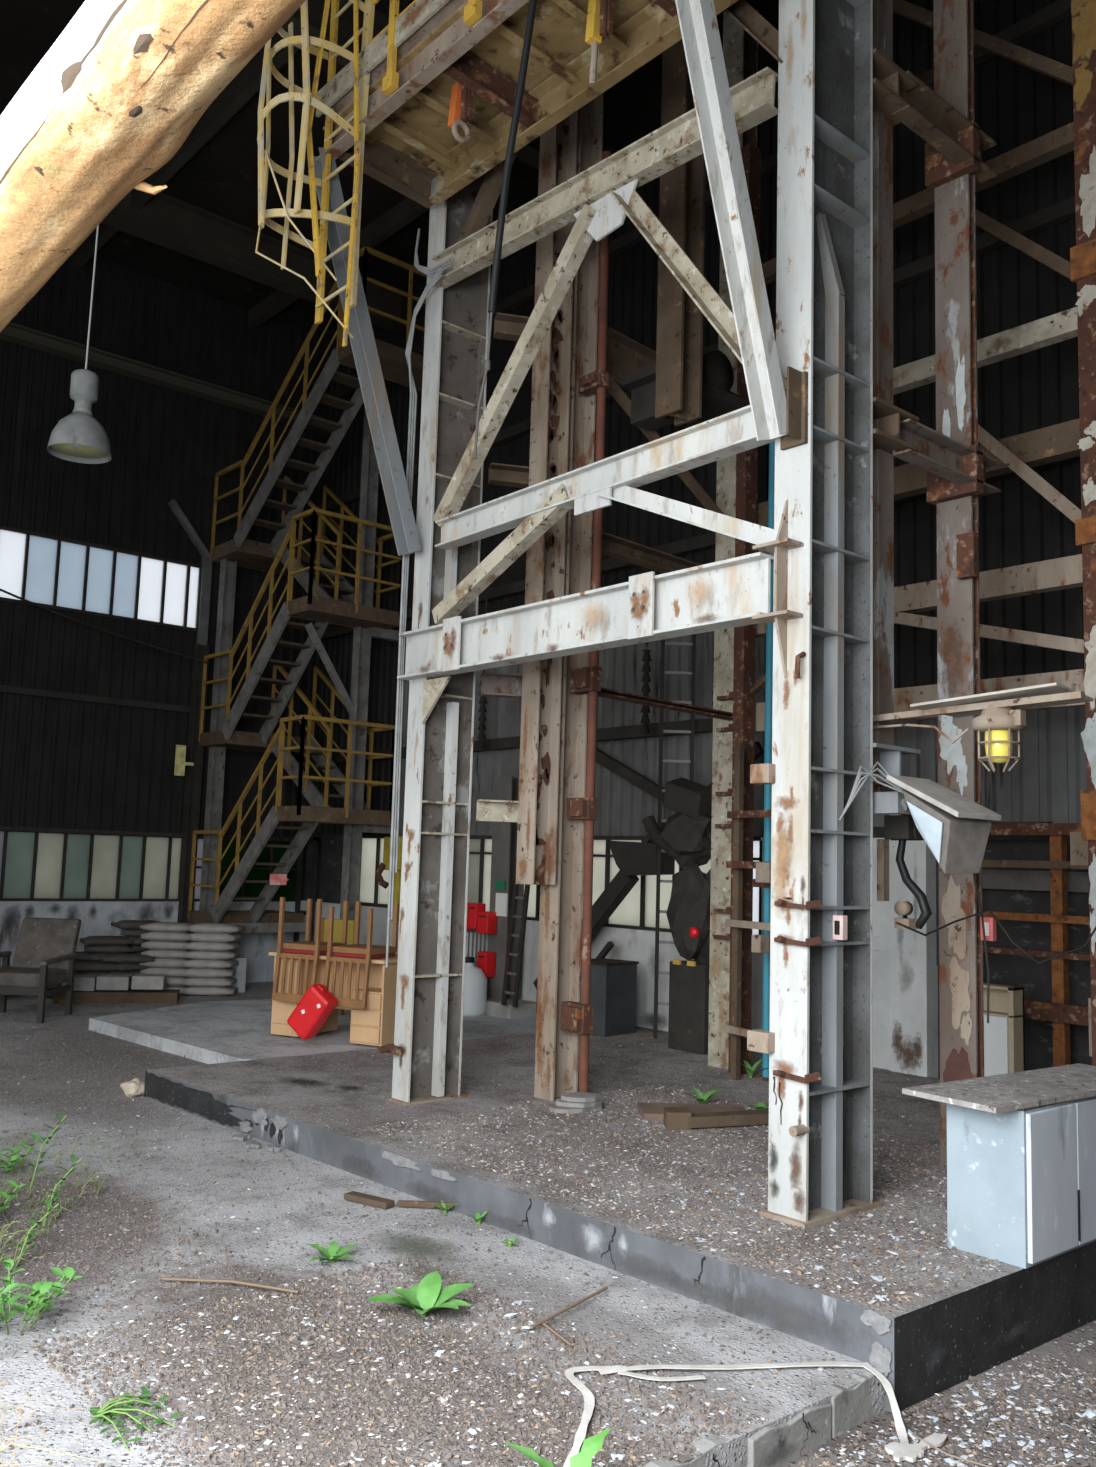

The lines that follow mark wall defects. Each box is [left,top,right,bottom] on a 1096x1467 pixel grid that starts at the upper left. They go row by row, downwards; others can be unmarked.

peeling [1077,421,1096,451]
peeling [1083,477,1096,506]
rust [631,591,648,618]
rust [694,587,713,622]
rust [444,632,456,654]
rust [777,798,805,964]
rust [778,1062,803,1125]
rust [791,1154,803,1210]
peeling [0,1018,842,1467]
crack [694,1256,706,1304]
peeling [800,1341,1096,1467]